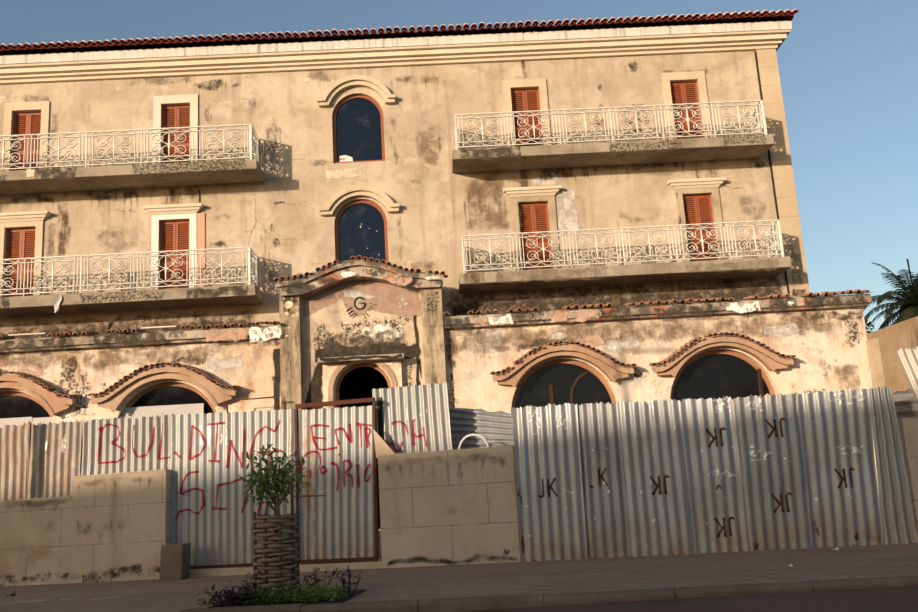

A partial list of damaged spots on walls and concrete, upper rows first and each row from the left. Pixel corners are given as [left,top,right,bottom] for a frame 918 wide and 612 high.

damp [459,146,521,161]
damp [469,177,508,228]
damp [50,212,68,254]
peeling [205,271,421,342]
damp [427,250,867,408]
damp [305,315,421,410]
damp [62,565,142,583]